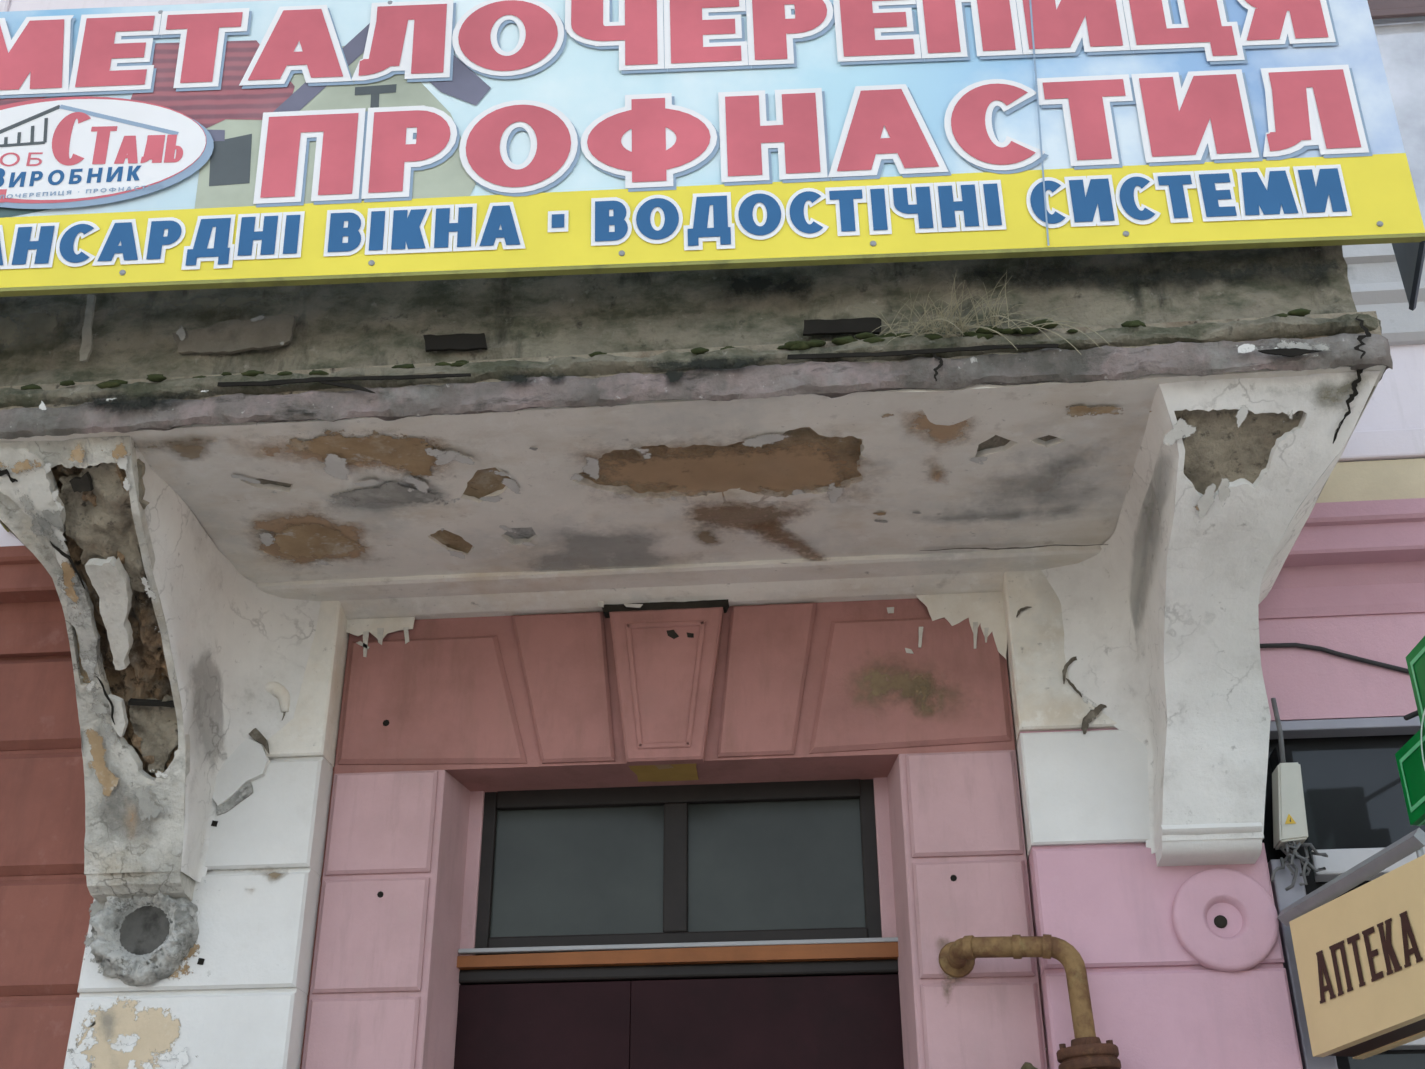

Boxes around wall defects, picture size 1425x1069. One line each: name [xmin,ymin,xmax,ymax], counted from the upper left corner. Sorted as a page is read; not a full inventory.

damp [727,275,812,297]
damp [969,258,1344,288]
damp [504,373,565,384]
damp [654,356,766,383]
crack [1333,316,1371,443]
crack [0,469,18,483]
spalling [571,427,862,503]
spalling [1163,405,1303,518]
crack [50,541,85,589]
flaking render [0,442,178,823]
peeling [905,592,1007,660]
crack [96,676,115,725]